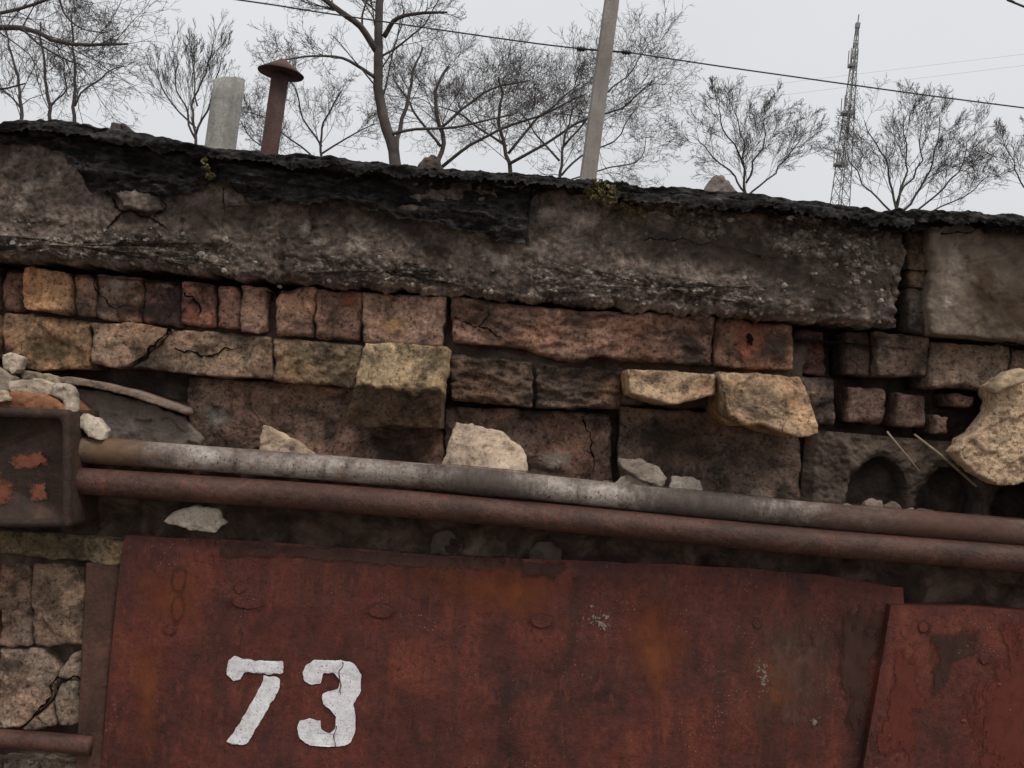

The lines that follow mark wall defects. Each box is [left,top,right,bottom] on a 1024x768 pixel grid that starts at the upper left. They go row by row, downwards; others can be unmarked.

crack [104,190,170,234]
crack [128,293,244,367]
crack [581,416,595,474]
rust [819,505,1024,545]
crack [18,675,81,730]